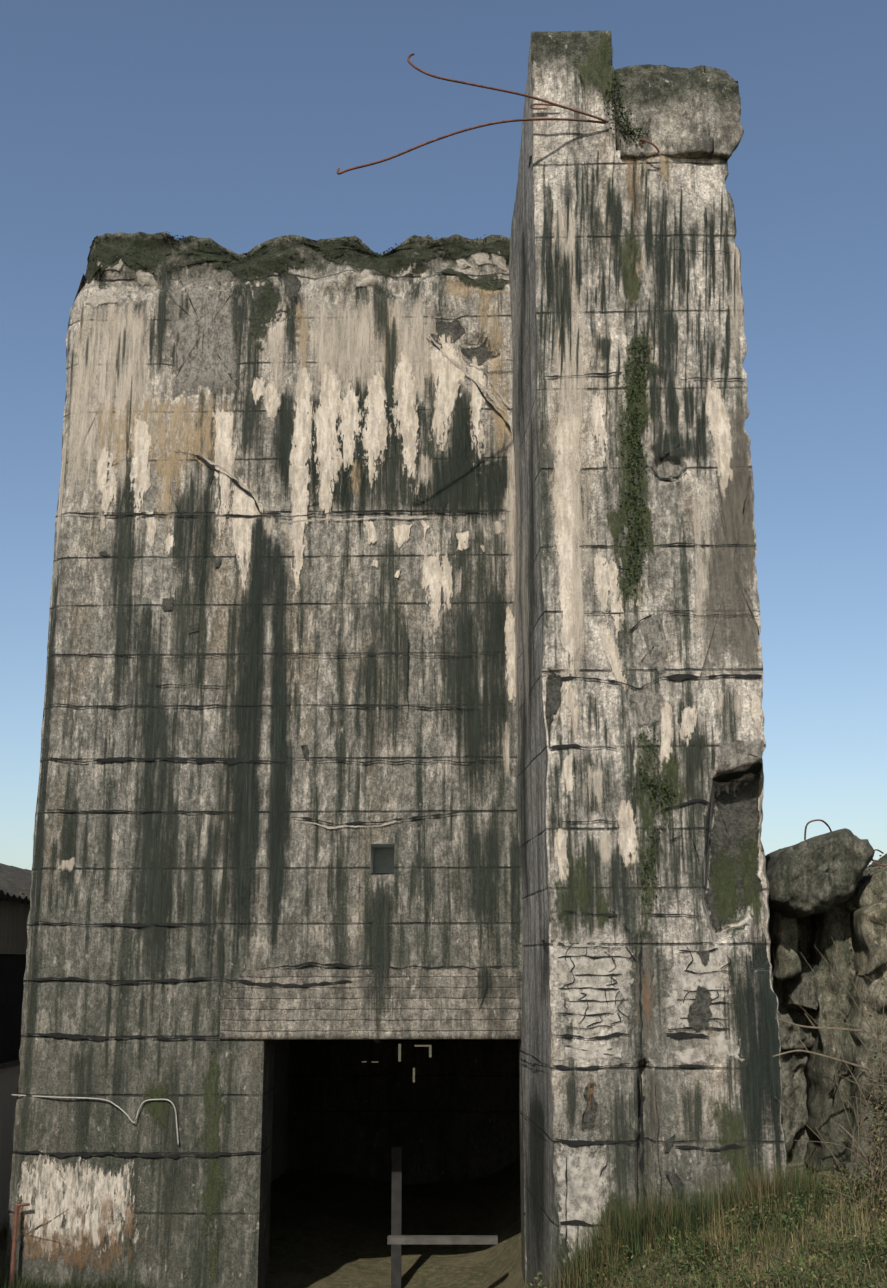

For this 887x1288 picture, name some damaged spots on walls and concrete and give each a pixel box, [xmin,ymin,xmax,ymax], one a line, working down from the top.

spalling [82,289,117,308]
spalling [97,238,510,400]
leakage [32,577,118,948]
leakage [57,150,762,1288]
crack [562,817,616,825]
crack [660,799,711,841]
spalling [665,772,762,1064]
crack [519,910,746,1259]
peeling [16,1153,141,1259]